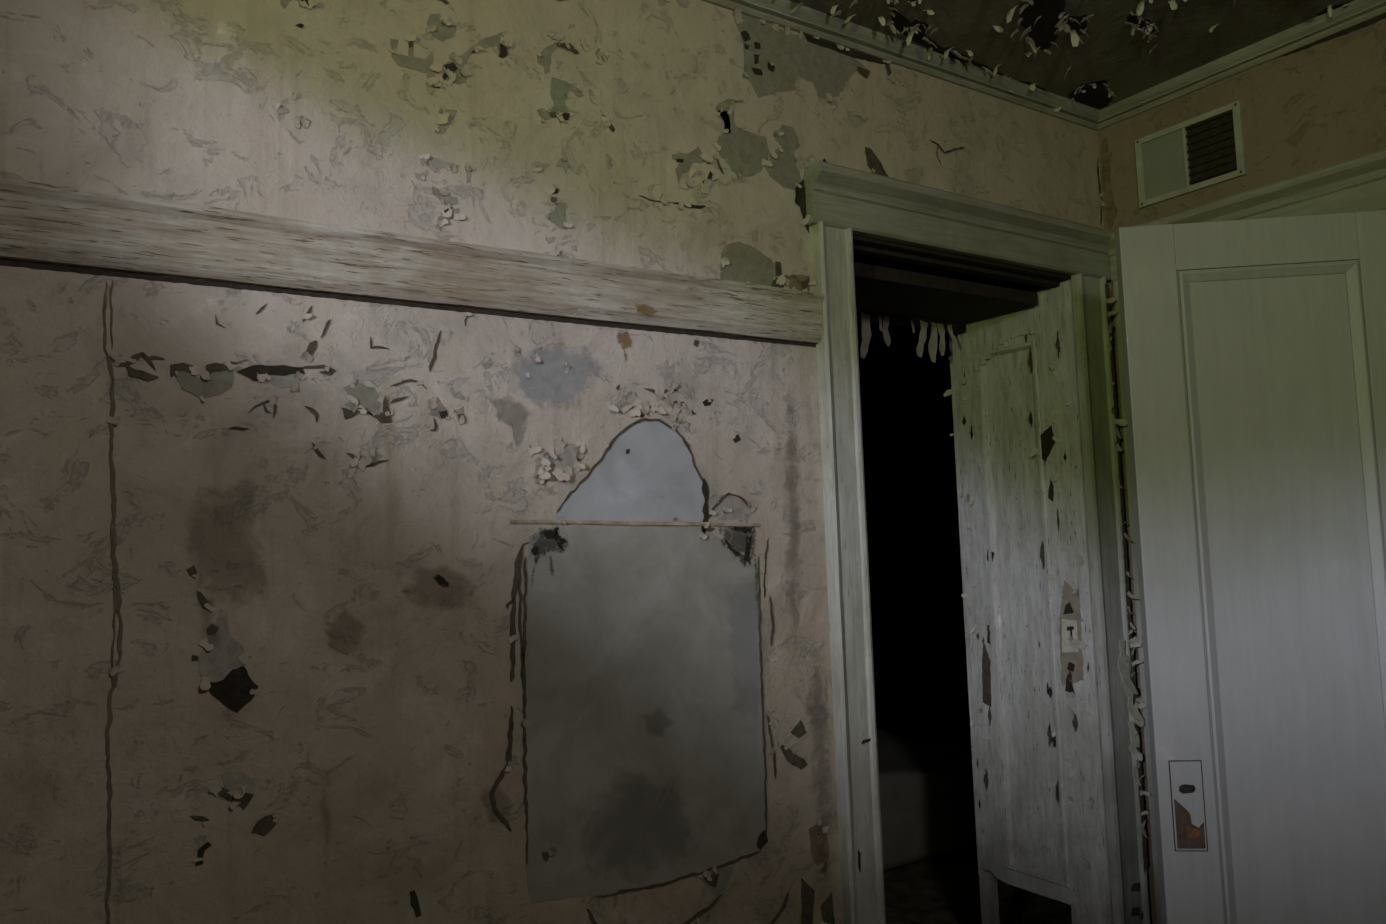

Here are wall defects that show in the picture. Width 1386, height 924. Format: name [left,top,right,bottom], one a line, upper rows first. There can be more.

peeling [388,0,512,88]
peeling [878,0,1046,93]
peeling [992,0,1094,57]
peeling [672,0,895,232]
crack [301,306,335,375]
crack [370,337,389,349]
crack [390,312,472,403]
crack [103,281,326,924]
flaking render [187,565,261,712]
flaking render [524,382,808,924]
crack [587,538,777,924]
crack [770,892,789,924]